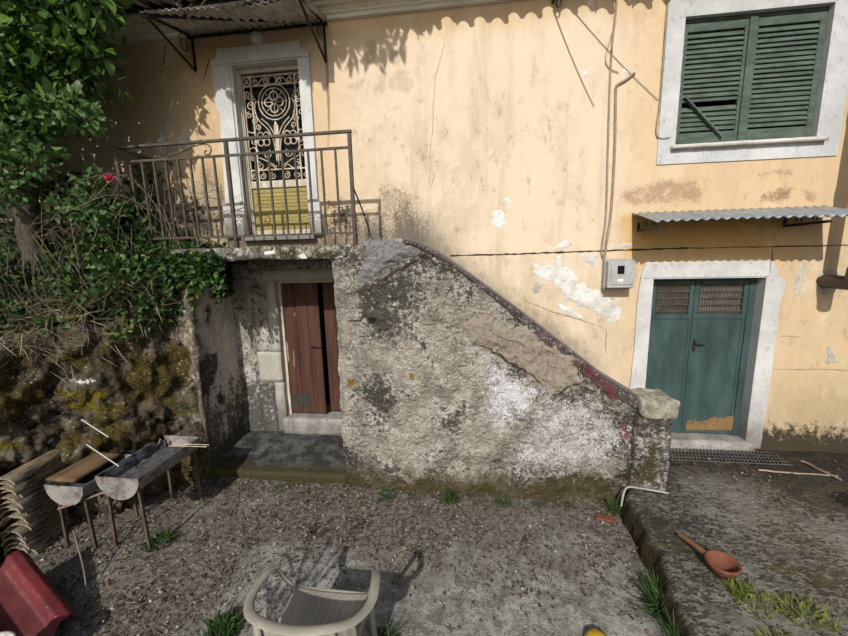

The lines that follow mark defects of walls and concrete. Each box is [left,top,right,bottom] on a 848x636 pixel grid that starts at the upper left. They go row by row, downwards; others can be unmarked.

crack [429,13,447,189]
peeling [492,198,512,228]
peeling [531,240,625,323]
peeling [472,348,632,480]